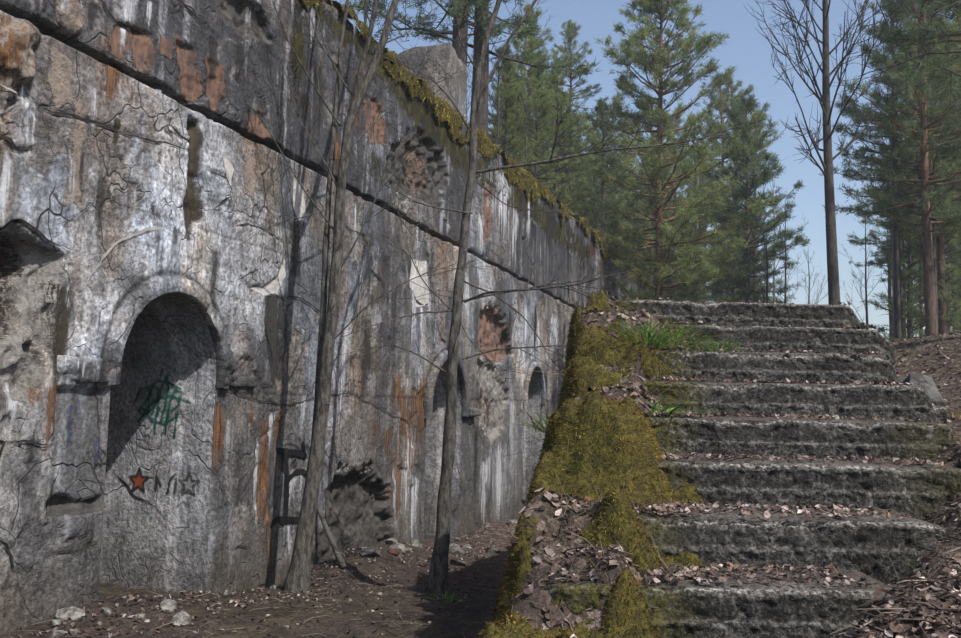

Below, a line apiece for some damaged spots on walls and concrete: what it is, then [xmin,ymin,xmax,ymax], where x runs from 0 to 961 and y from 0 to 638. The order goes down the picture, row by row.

corrosion [0,15,31,90]
crack [41,107,189,150]
corrosion [101,64,135,101]
spalling [362,95,450,204]
spalling [0,218,66,404]
spalling [477,304,511,445]
crack [0,541,21,574]
crack [0,439,54,457]
corrosion [212,404,227,464]
corrosion [248,411,283,564]
spalling [311,464,392,565]
corrosion [372,373,425,522]